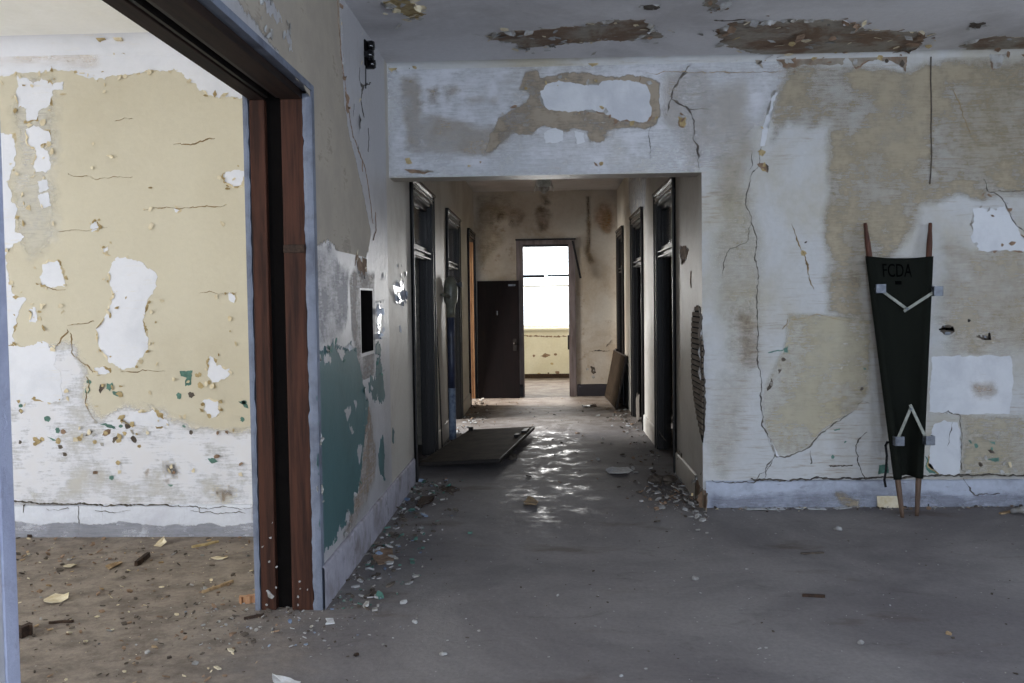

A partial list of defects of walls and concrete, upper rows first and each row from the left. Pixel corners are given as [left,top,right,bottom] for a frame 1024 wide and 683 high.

peeling [388,4,937,176]
crack [648,65,784,173]
peeling [0,37,244,456]
peeling [238,0,408,553]
crack [712,147,1024,496]
peeling [970,193,1024,253]
peeling [925,355,1018,475]
crack [14,500,253,535]